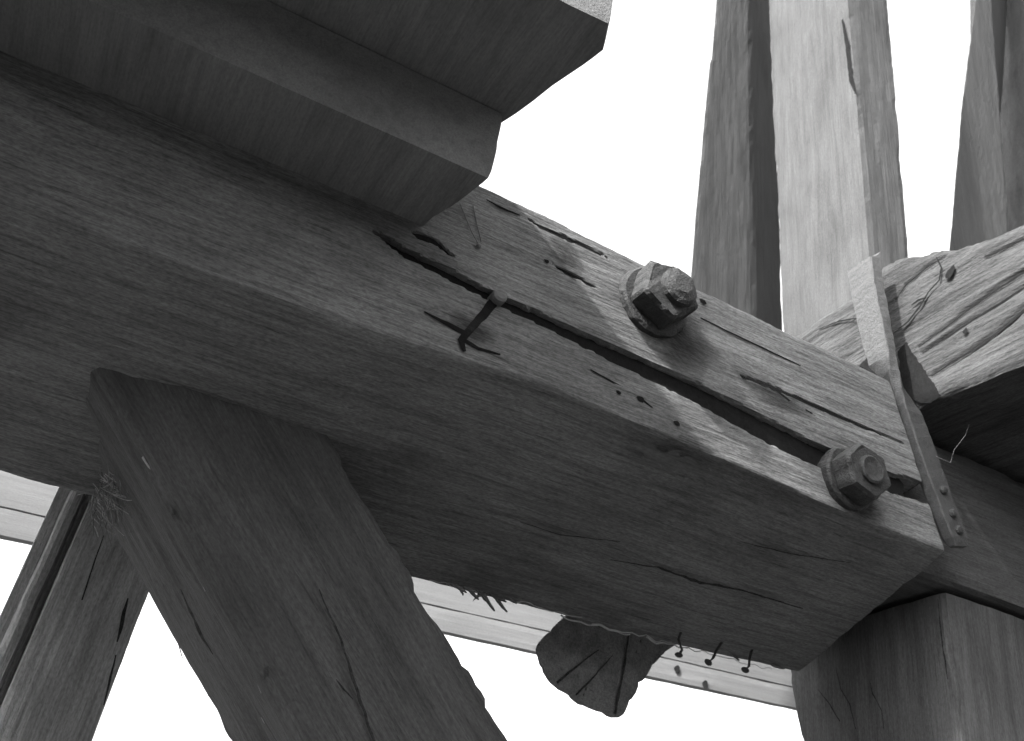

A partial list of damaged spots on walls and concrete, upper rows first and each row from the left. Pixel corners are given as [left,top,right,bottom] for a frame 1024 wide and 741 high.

crack [841,19,856,92]
crack [486,199,606,258]
crack [896,256,946,330]
crack [383,233,826,466]
crack [741,376,887,437]
crack [886,477,904,495]
crack [81,535,104,600]
crack [521,522,803,609]
crack [103,598,129,705]